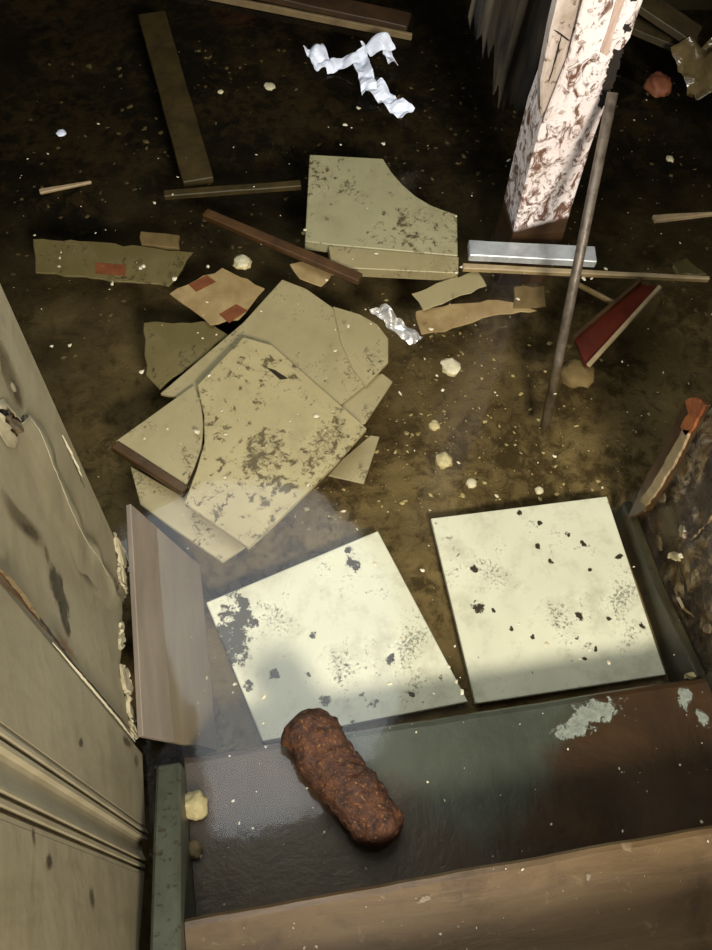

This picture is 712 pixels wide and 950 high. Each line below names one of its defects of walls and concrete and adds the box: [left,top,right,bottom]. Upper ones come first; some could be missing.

crack [62,435,85,488]
water stain [46,549,71,637]
peeling [553,696,621,740]
peeling [677,672,709,727]